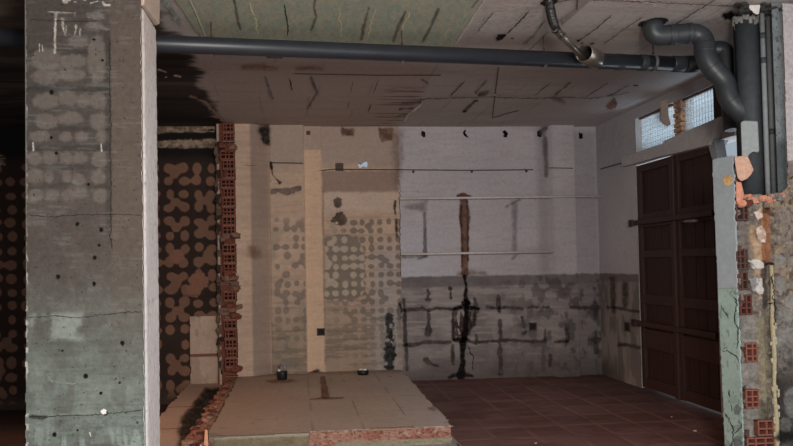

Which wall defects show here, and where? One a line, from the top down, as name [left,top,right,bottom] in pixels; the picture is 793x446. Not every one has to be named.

spalling [723,156,772,242]
corrosion [457,193,471,277]
peeling [736,249,774,315]
water stain [449,274,480,379]
crack [721,291,739,362]
spalling [743,342,758,363]
crack [725,391,742,446]
spalling [734,388,760,414]
spalling [733,418,775,446]